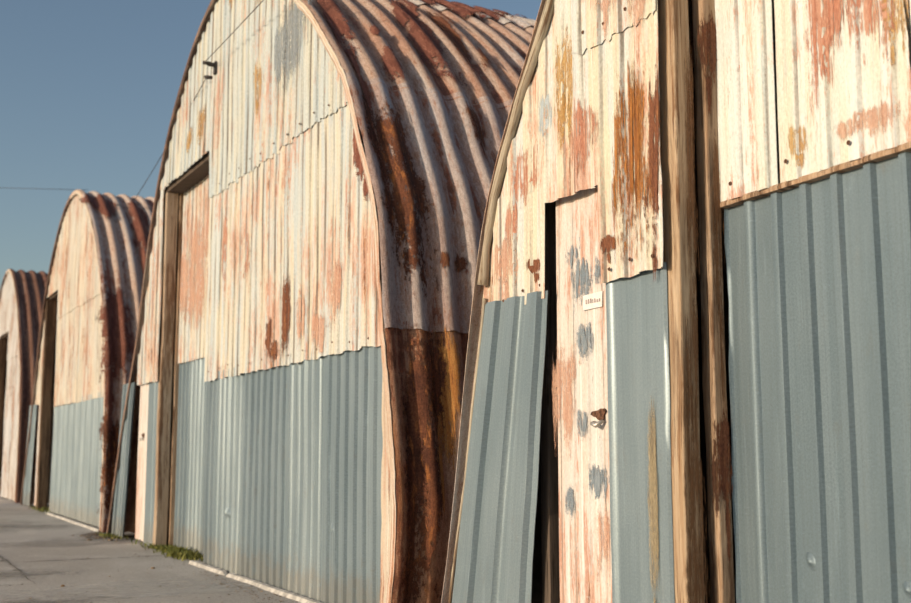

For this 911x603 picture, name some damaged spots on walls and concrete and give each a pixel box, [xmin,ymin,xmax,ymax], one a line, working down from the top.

rust [79,193,150,276]
rust [317,0,468,298]
rust [390,0,527,87]
rust [95,284,134,515]
rust [398,327,461,603]